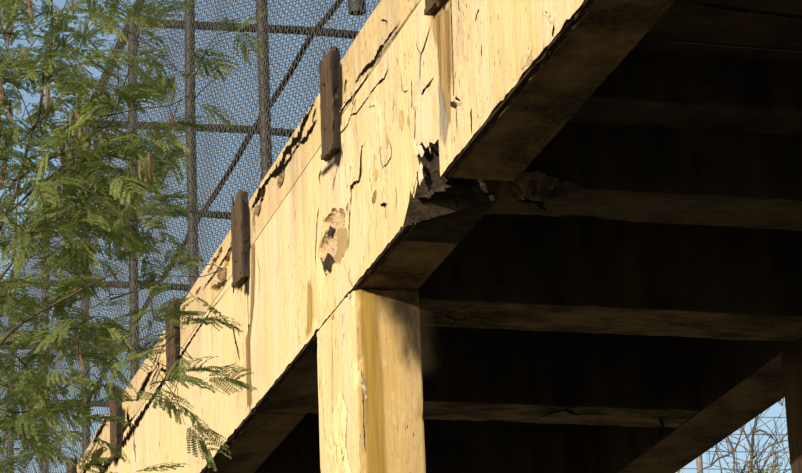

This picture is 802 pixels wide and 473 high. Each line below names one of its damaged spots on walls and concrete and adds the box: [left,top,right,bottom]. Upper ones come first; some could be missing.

crack [251,99,316,211]
peeling [316,65,389,283]
crack [341,1,418,133]
peeling [399,78,455,198]
crack [393,53,472,133]
corrosion [430,8,451,124]
crack [92,246,232,473]
damp [360,287,426,473]